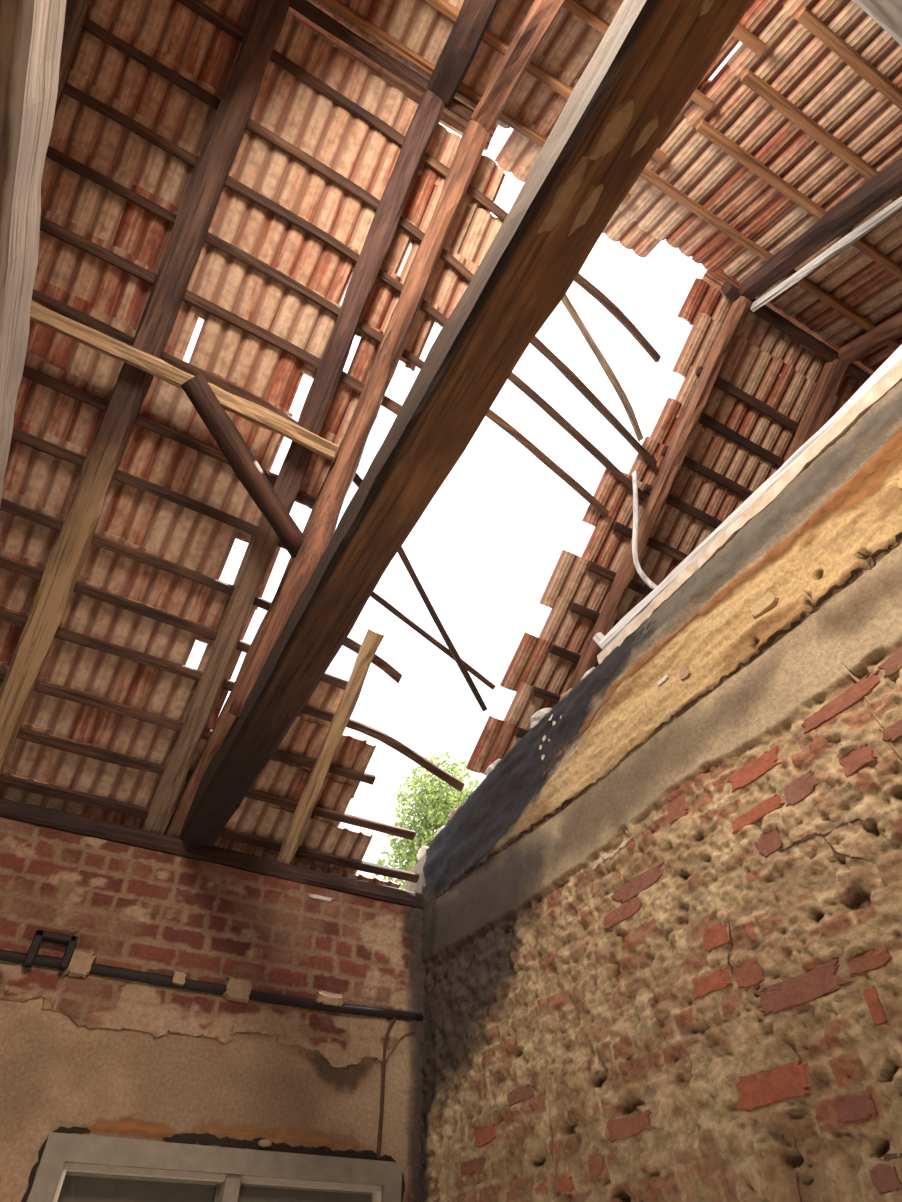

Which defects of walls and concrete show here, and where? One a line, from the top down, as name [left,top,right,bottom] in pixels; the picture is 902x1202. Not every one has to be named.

crack [437,532,902,898]
flaking render [727,746,783,793]
flaking render [801,649,902,734]
flaking render [839,720,902,778]
flaking render [732,770,818,858]
flaking render [603,861,664,930]
spalling [0,817,413,1068]
flaking render [692,946,892,1026]
damp [308,1056,371,1090]
flaking render [735,1059,812,1112]
flaking render [869,1165,902,1194]
crack [875,1152,902,1160]